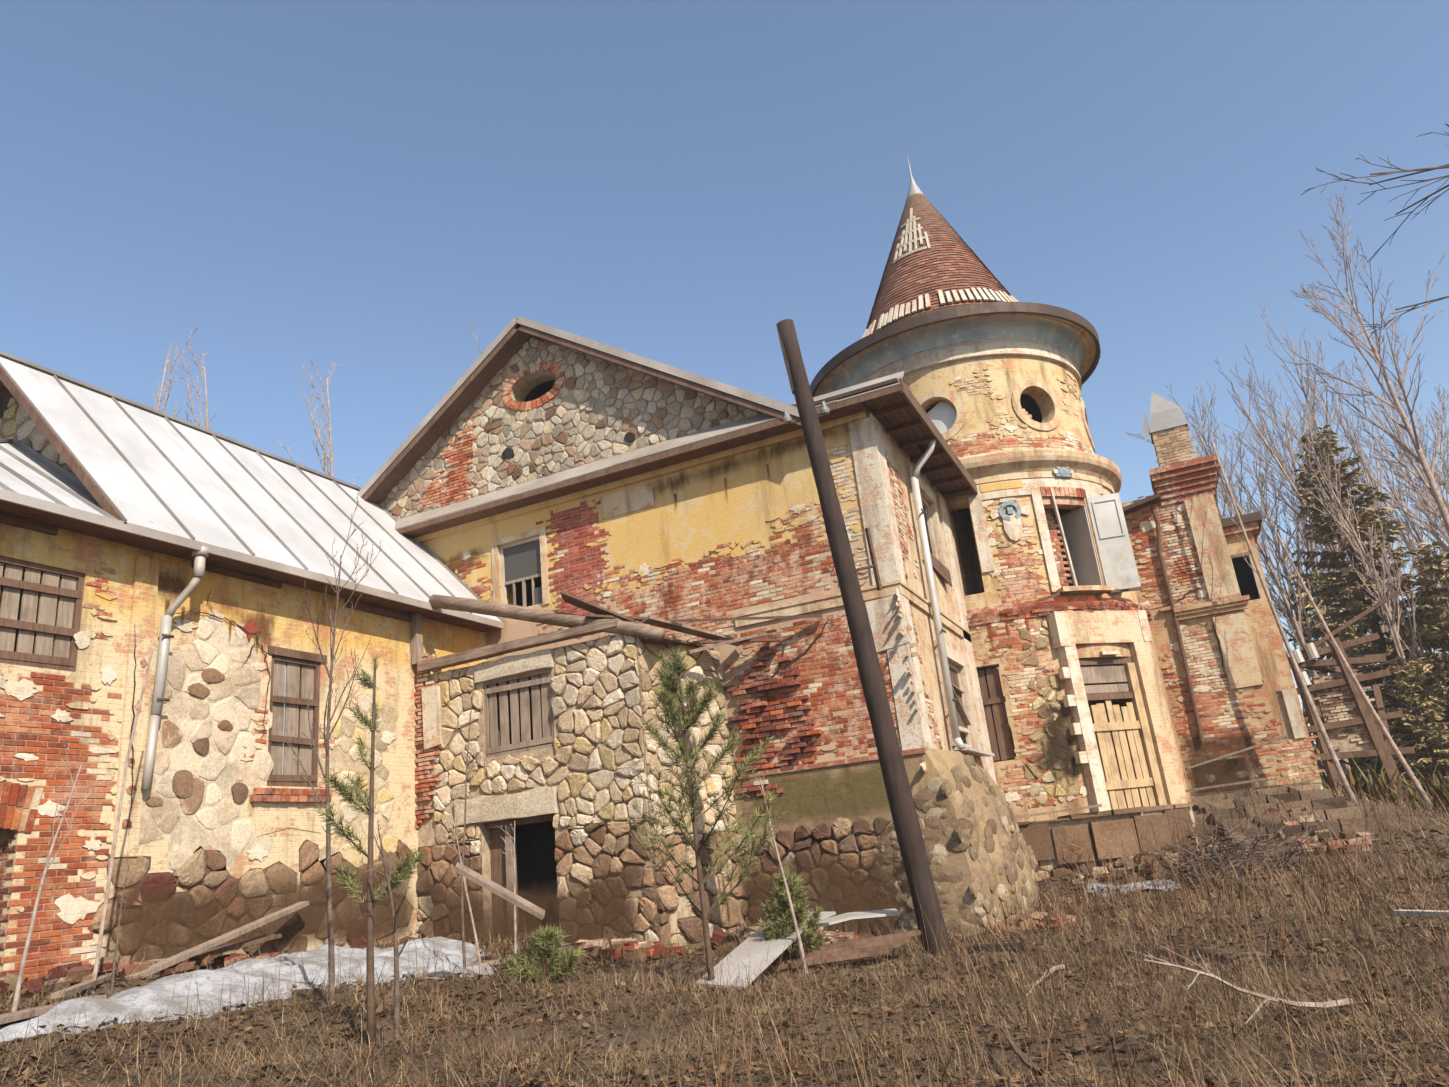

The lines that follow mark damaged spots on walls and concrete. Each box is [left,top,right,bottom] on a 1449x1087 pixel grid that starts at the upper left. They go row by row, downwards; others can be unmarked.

spalling [73,566,118,649]
flaking render [0,665,194,981]
flaking render [188,668,225,698]
flaking render [192,720,233,755]
flaking render [231,779,265,803]
flaking render [418,415,481,511]
flaking render [536,496,878,806]
peeling [826,440,870,588]
spalling [871,453,943,773]
flaking render [970,499,1088,808]
flaking render [1125,495,1208,609]
flaking render [1158,618,1326,793]